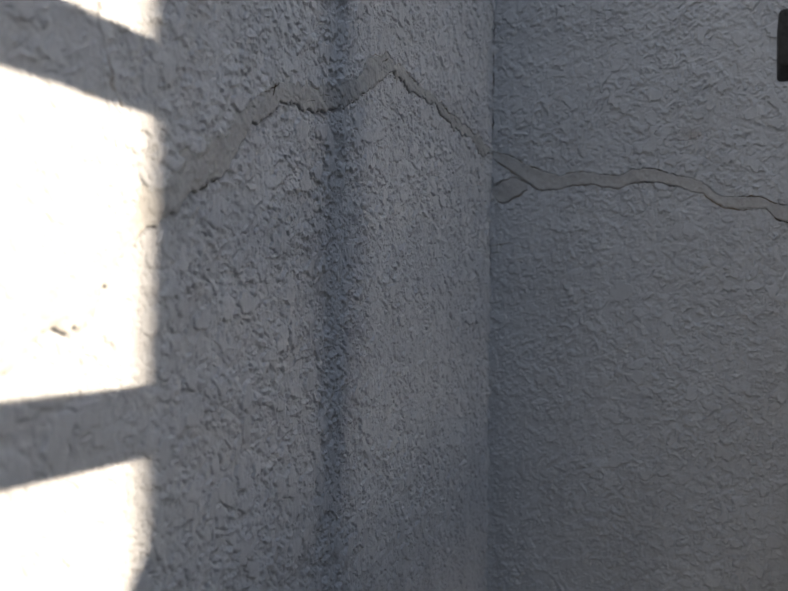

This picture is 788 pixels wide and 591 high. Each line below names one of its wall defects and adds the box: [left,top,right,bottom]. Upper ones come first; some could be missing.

crack [0,0,788,375]